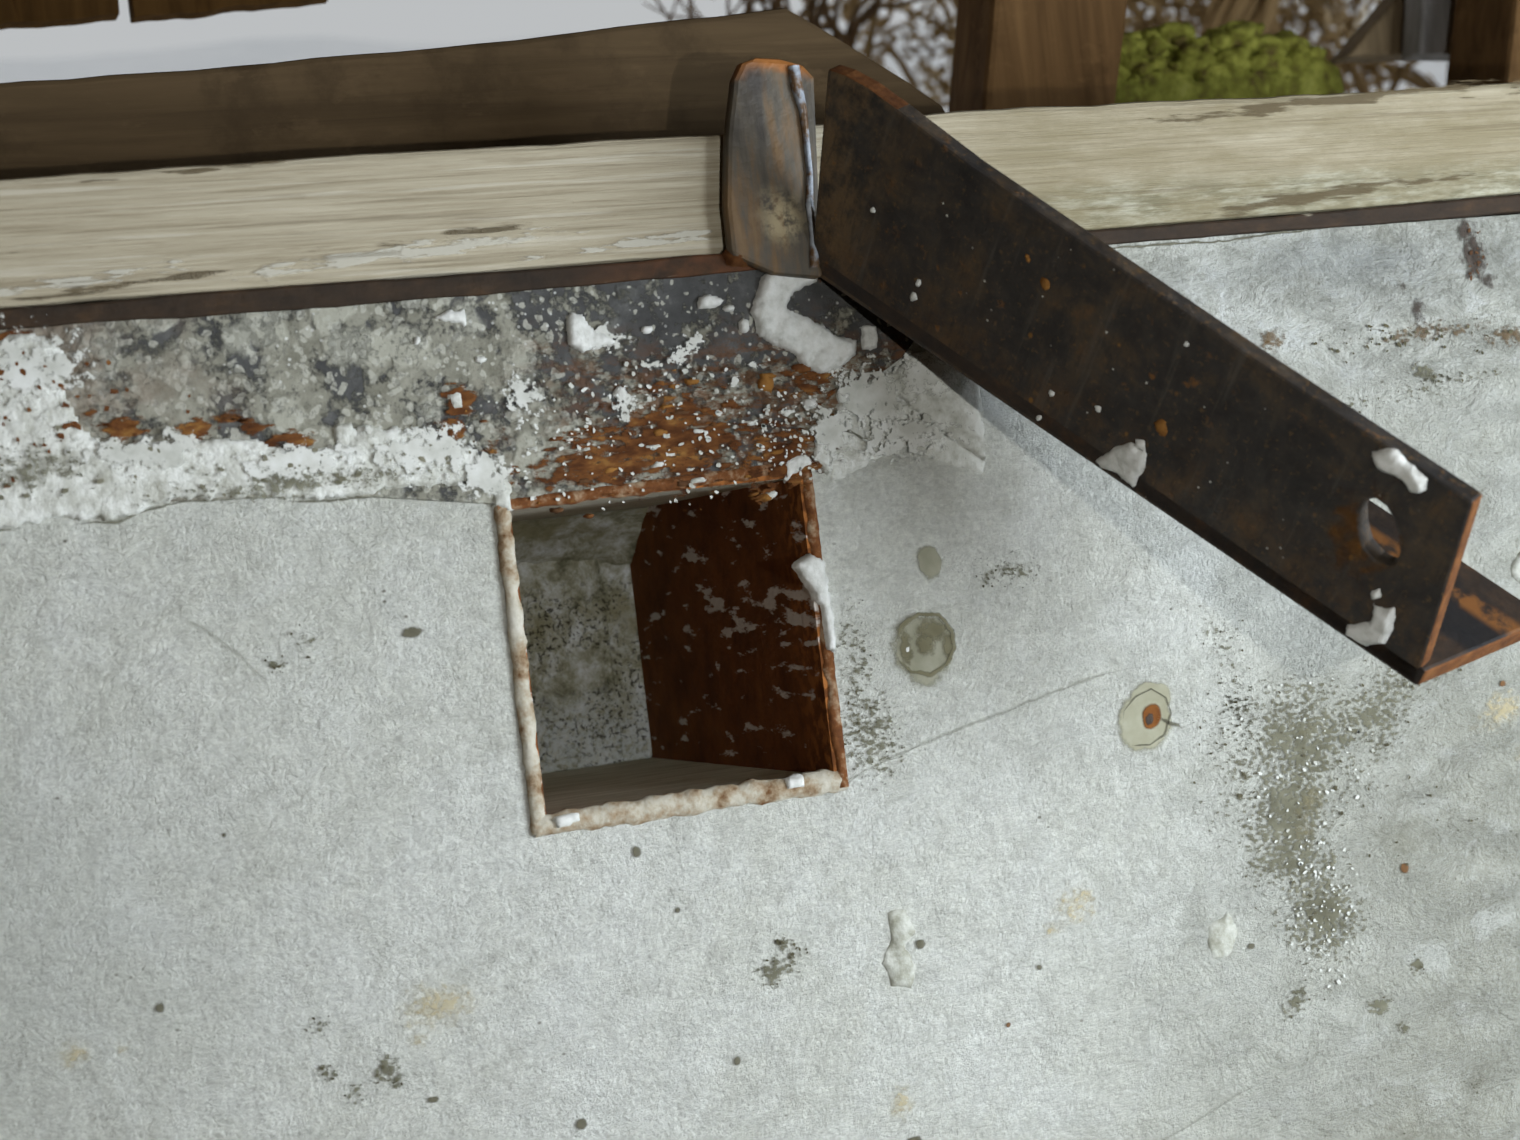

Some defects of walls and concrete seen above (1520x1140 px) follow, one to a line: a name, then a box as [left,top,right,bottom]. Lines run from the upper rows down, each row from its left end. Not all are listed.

peeling [334,423,358,449]
peeling [447,392,462,408]
rust [433,349,844,519]
water stain [1119,619,1439,1022]